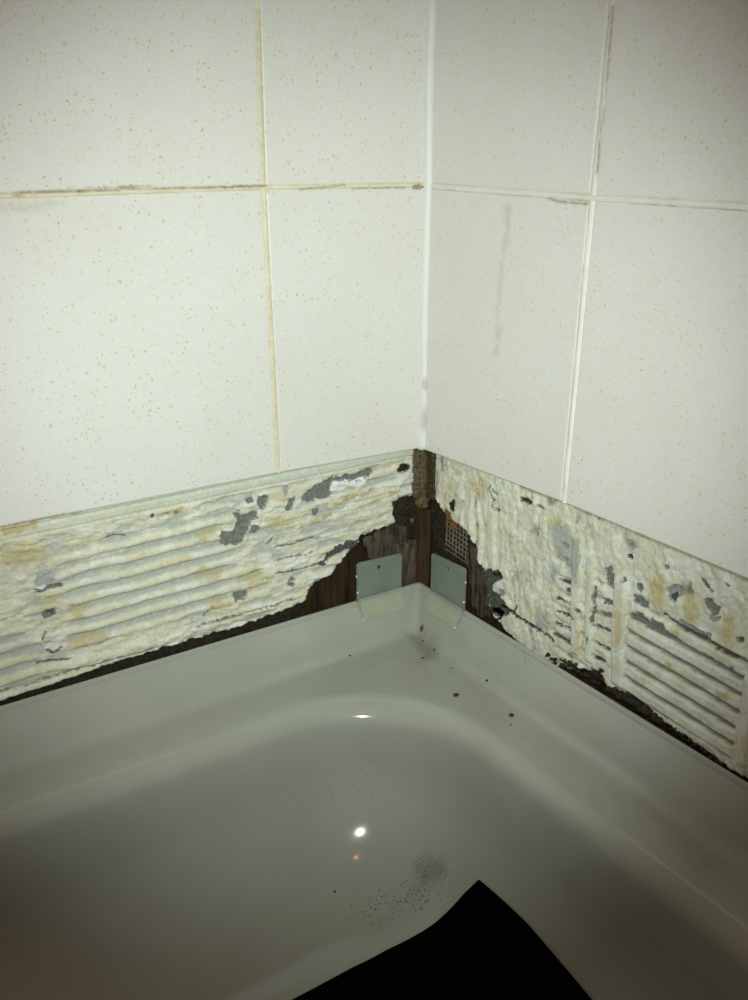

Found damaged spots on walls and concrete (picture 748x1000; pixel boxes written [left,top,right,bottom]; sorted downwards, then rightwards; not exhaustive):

spalling [283,468,372,515]
spalling [220,495,268,545]
spalling [319,539,359,566]
spalling [233,590,247,602]
spalling [485,569,511,617]
spalling [621,577,679,639]
spalling [669,585,682,602]
spalling [705,598,721,620]